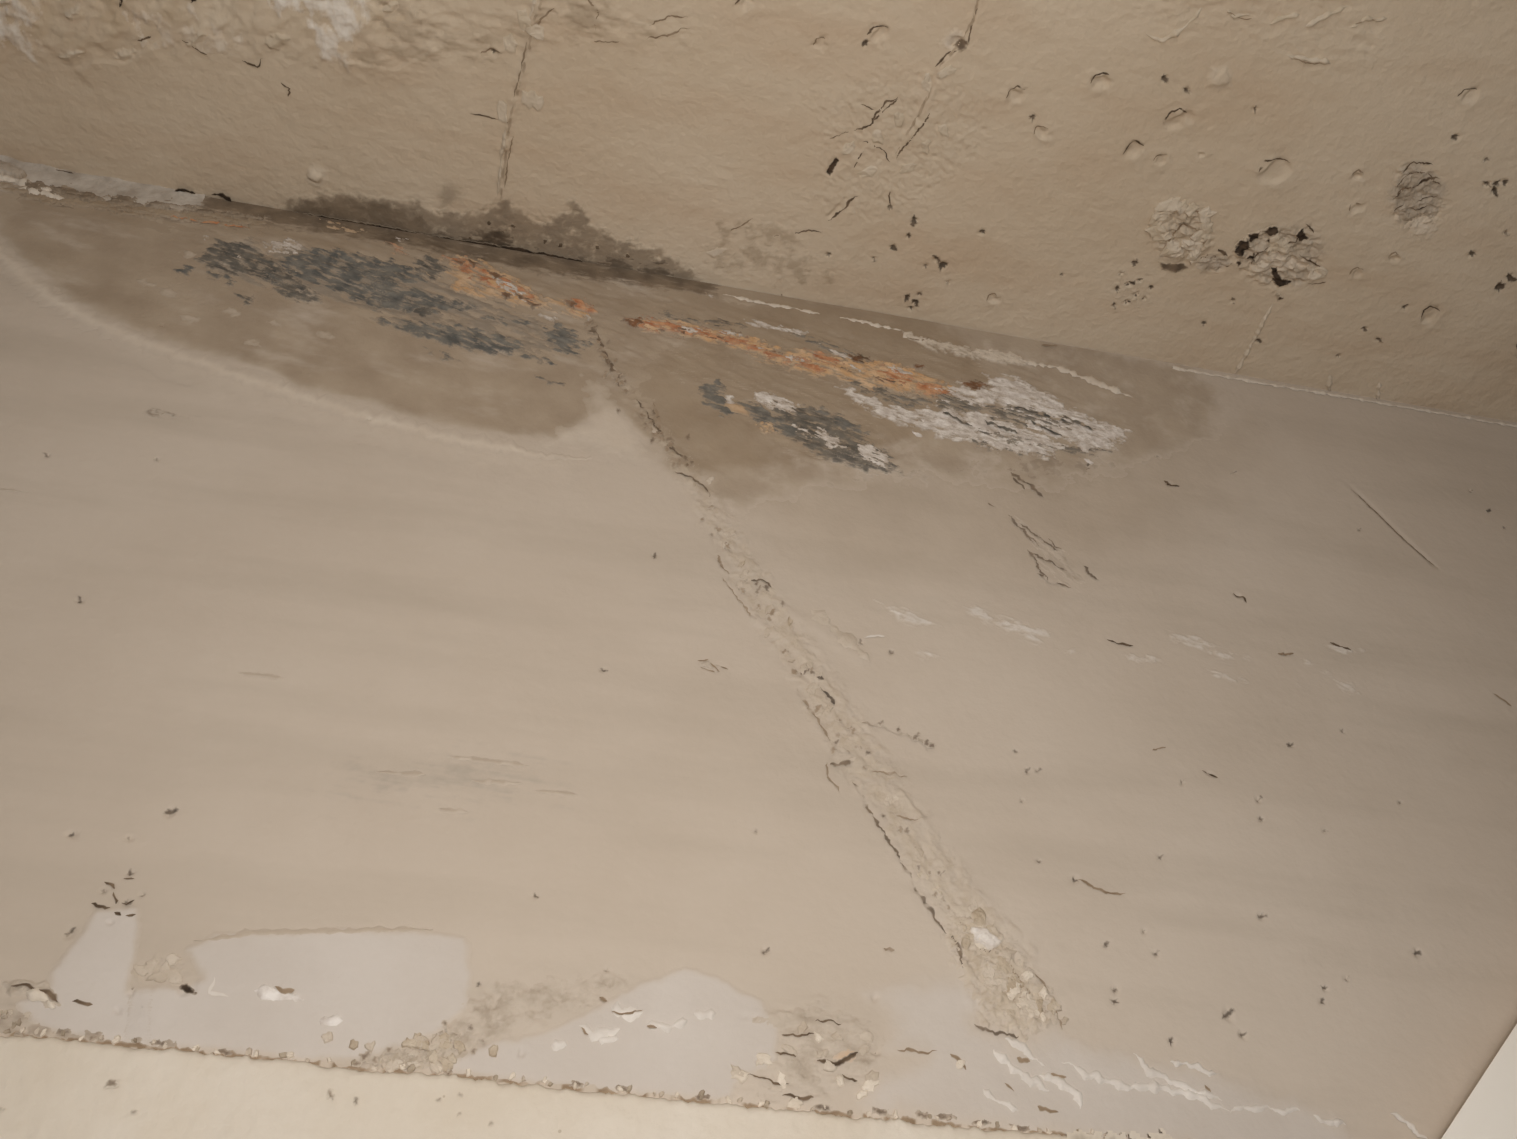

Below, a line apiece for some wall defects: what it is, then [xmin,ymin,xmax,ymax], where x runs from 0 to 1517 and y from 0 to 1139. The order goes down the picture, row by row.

crack [473,0,554,200]
corrosion [426,254,599,322]
leakage [0,177,1300,649]
crack [596,332,710,497]
corrosion [619,314,959,399]
spalling [1106,187,1332,316]
spalling [1382,158,1451,243]
crack [717,555,771,618]
crack [797,676,1063,1030]
peeling [1,867,780,1100]